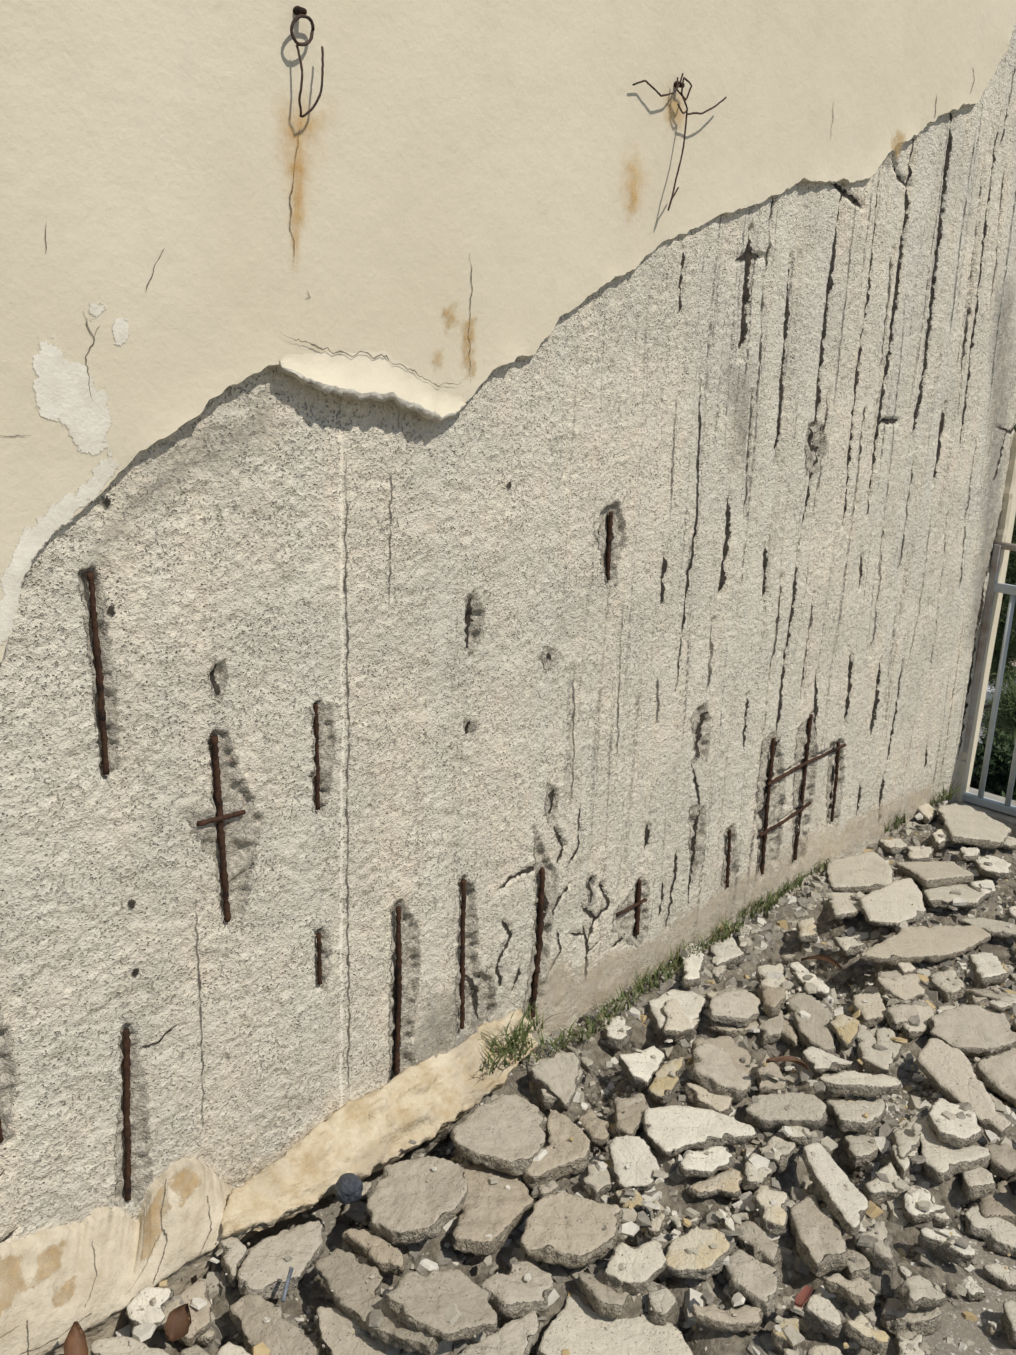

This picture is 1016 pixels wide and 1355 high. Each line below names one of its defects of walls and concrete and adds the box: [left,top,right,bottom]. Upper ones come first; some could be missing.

crack [657,198,790,721]
crack [742,67,1016,821]
spalling [86,571,110,775]
crack [617,601,625,754]
spalling [197,735,246,922]
crack [343,460,351,1098]
spalling [388,900,422,1083]
spalling [455,874,498,1037]
spalling [522,830,560,1022]
crack [466,663,625,1007]
crack [644,761,700,926]
spalling [114,1028,154,1207]